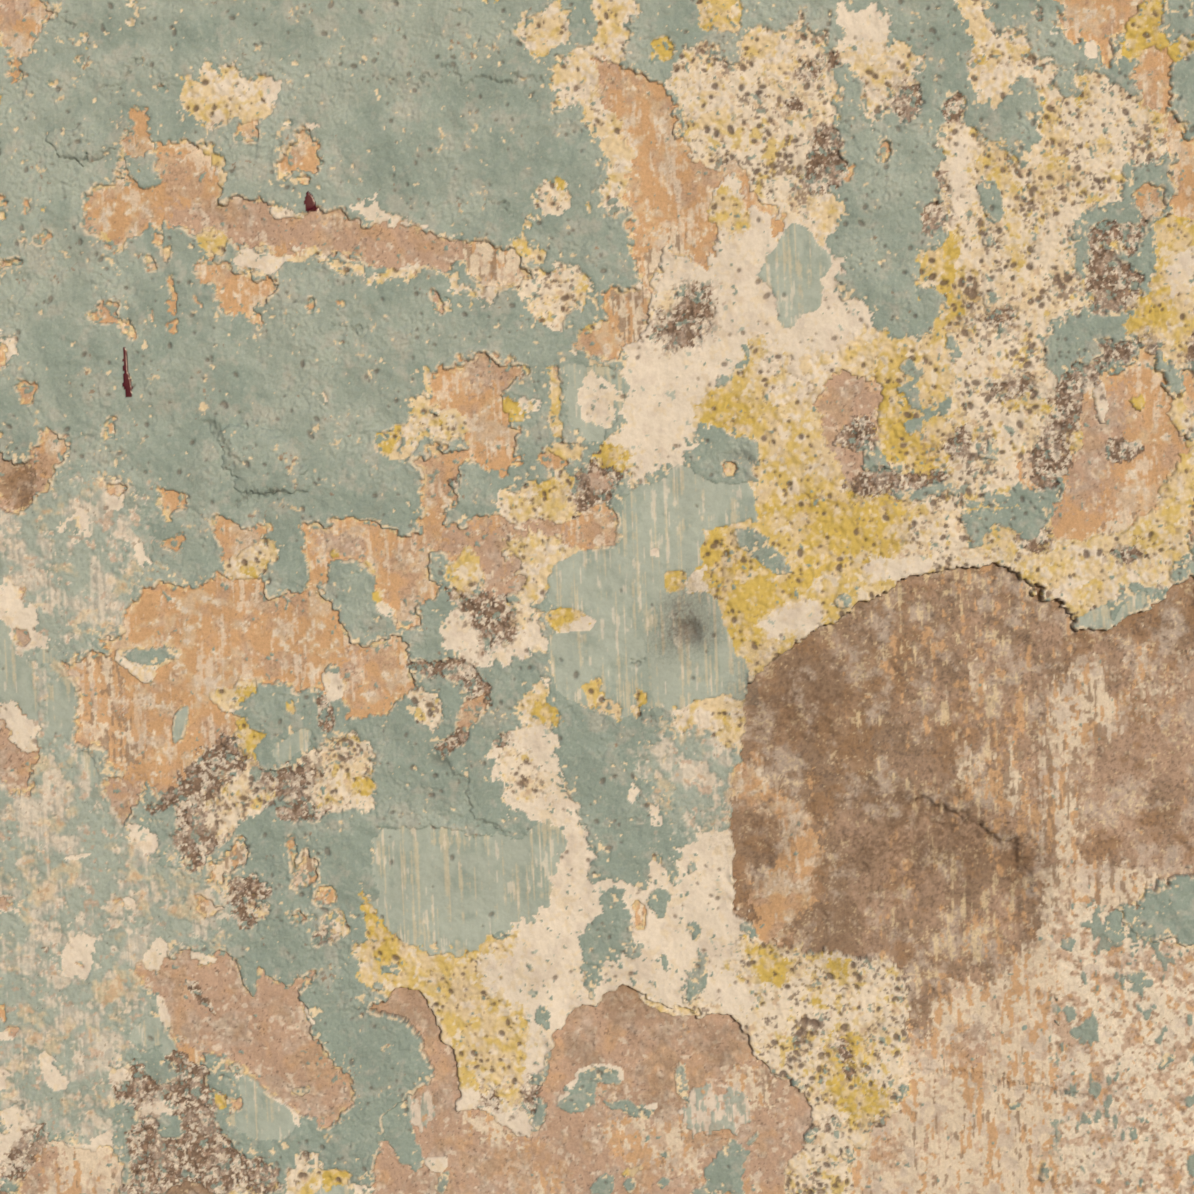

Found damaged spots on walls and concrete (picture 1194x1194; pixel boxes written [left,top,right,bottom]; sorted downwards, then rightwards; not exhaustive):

peeling [0,0,52,81]
peeling [158,62,282,141]
peeling [83,106,594,334]
peeling [0,337,18,368]
peeling [89,302,136,338]
spalling [350,0,1194,1194]
peeling [0,352,637,1194]